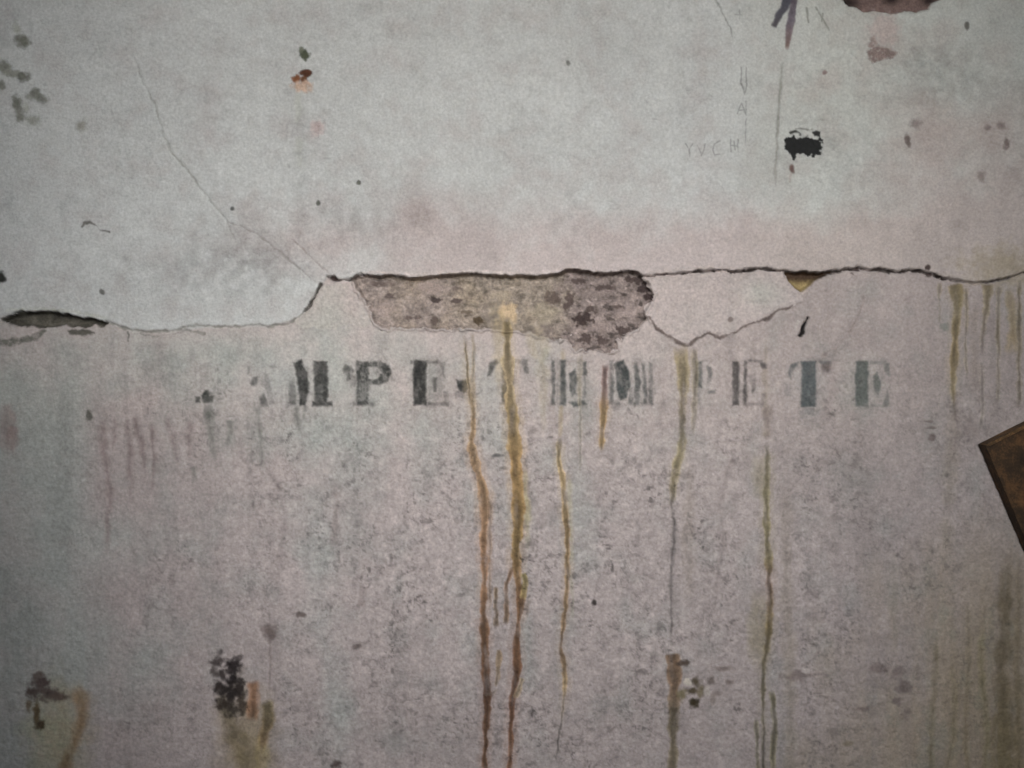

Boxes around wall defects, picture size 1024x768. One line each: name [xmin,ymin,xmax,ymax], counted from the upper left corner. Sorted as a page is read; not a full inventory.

crack [80,219,112,234]
crack [107,64,358,342]
spalling [0,305,110,348]
spalling [295,267,833,354]
crack [586,263,986,284]
rust [457,299,614,768]
damp [761,482,1024,768]